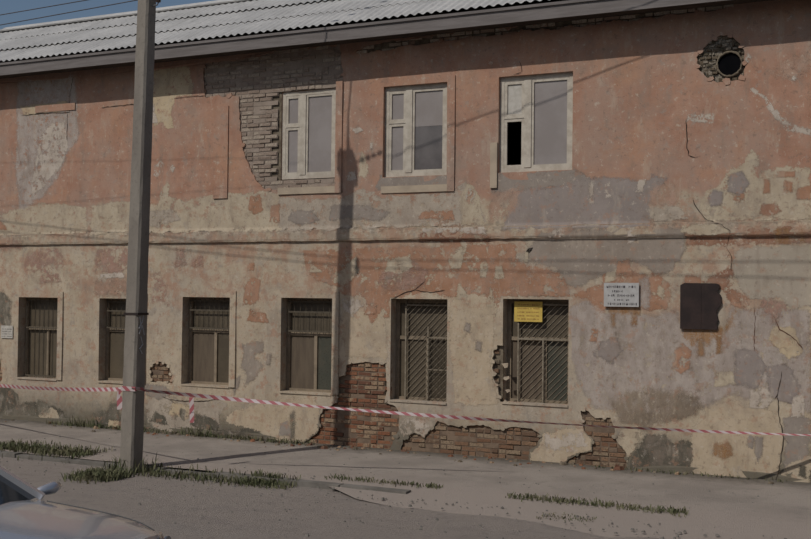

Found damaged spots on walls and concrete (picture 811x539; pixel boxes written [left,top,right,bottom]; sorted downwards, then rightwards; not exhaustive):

peeling [0,74,130,284]
peeling [144,4,811,483]
crack [754,308,803,351]
peeling [38,407,59,418]
crack [774,371,788,479]